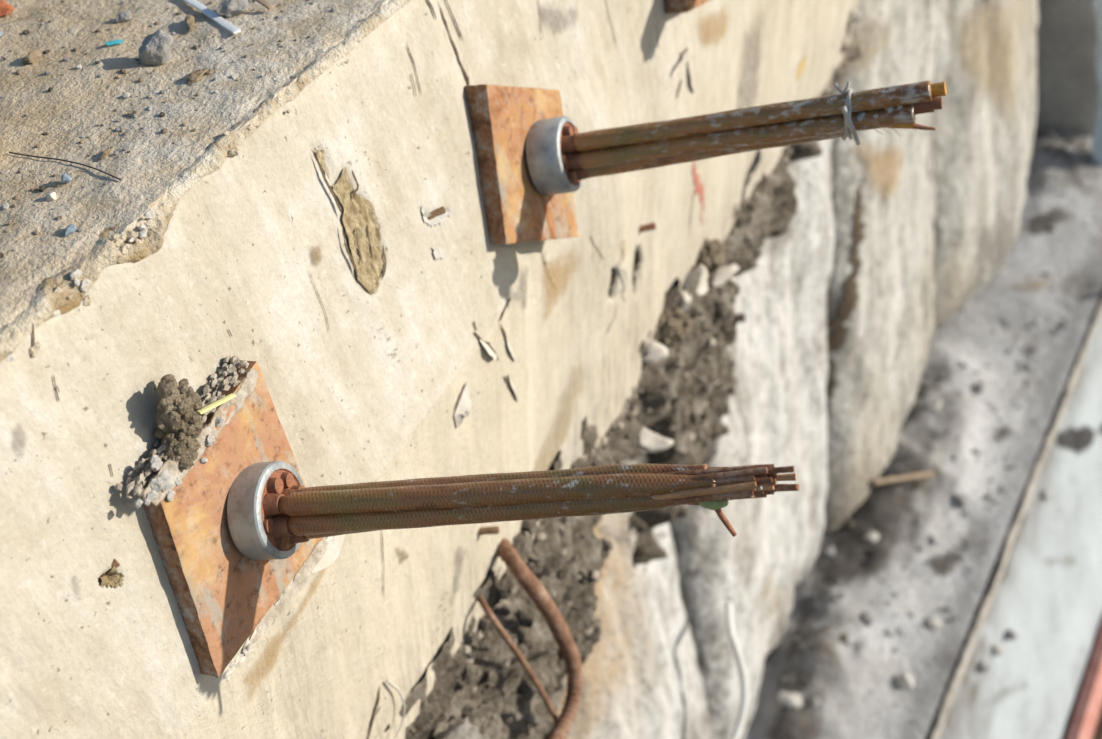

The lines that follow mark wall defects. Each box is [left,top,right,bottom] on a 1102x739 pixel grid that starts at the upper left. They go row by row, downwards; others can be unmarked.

spalling [0,0,411,363]
spalling [421,205,452,228]
spalling [608,250,641,302]
peeling [474,298,516,361]
peeling [453,382,471,428]
peeling [504,374,518,401]
spalling [477,538,583,739]